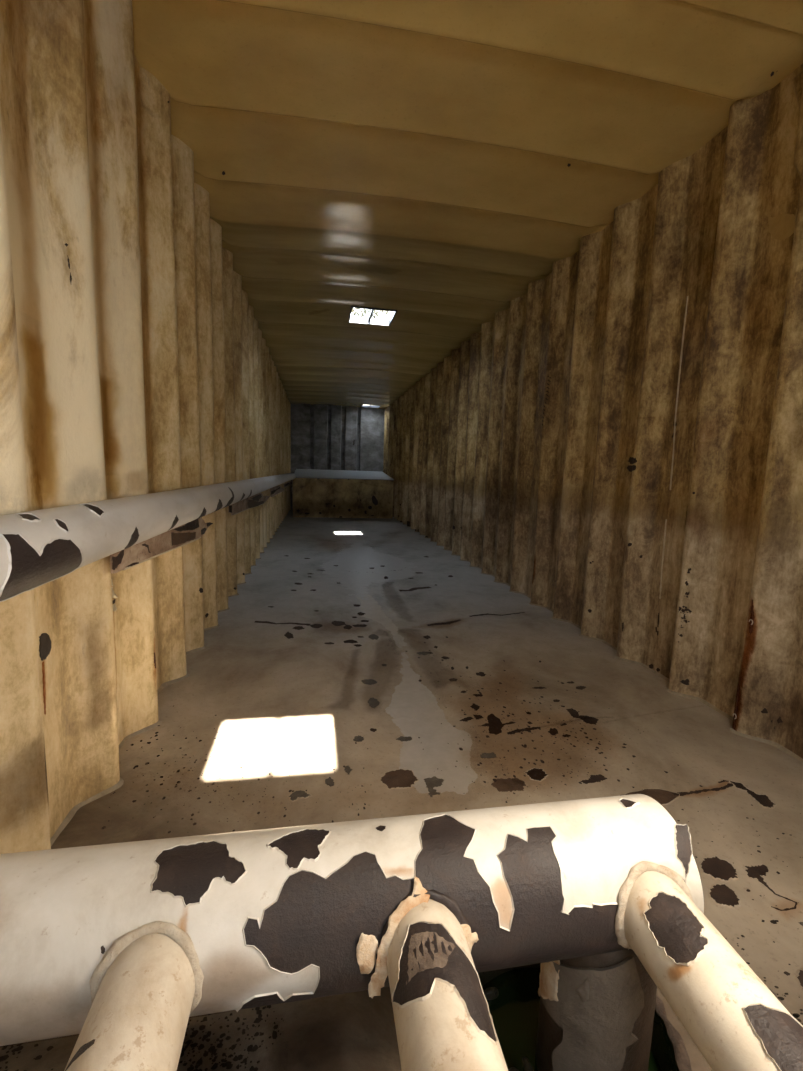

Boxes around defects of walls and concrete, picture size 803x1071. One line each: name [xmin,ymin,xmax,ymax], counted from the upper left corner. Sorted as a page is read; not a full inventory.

peeling [0,513,83,602]
peeling [79,504,104,517]
peeling [112,527,139,570]
peeling [169,499,232,535]
corrosion [732,600,756,730]
spalling [618,788,680,809]
peeling [150,840,248,908]
peeling [674,824,693,883]
peeling [236,814,629,1046]
peeling [643,891,710,967]
spalling [650,994,692,1071]
peeling [742,1003,803,1071]